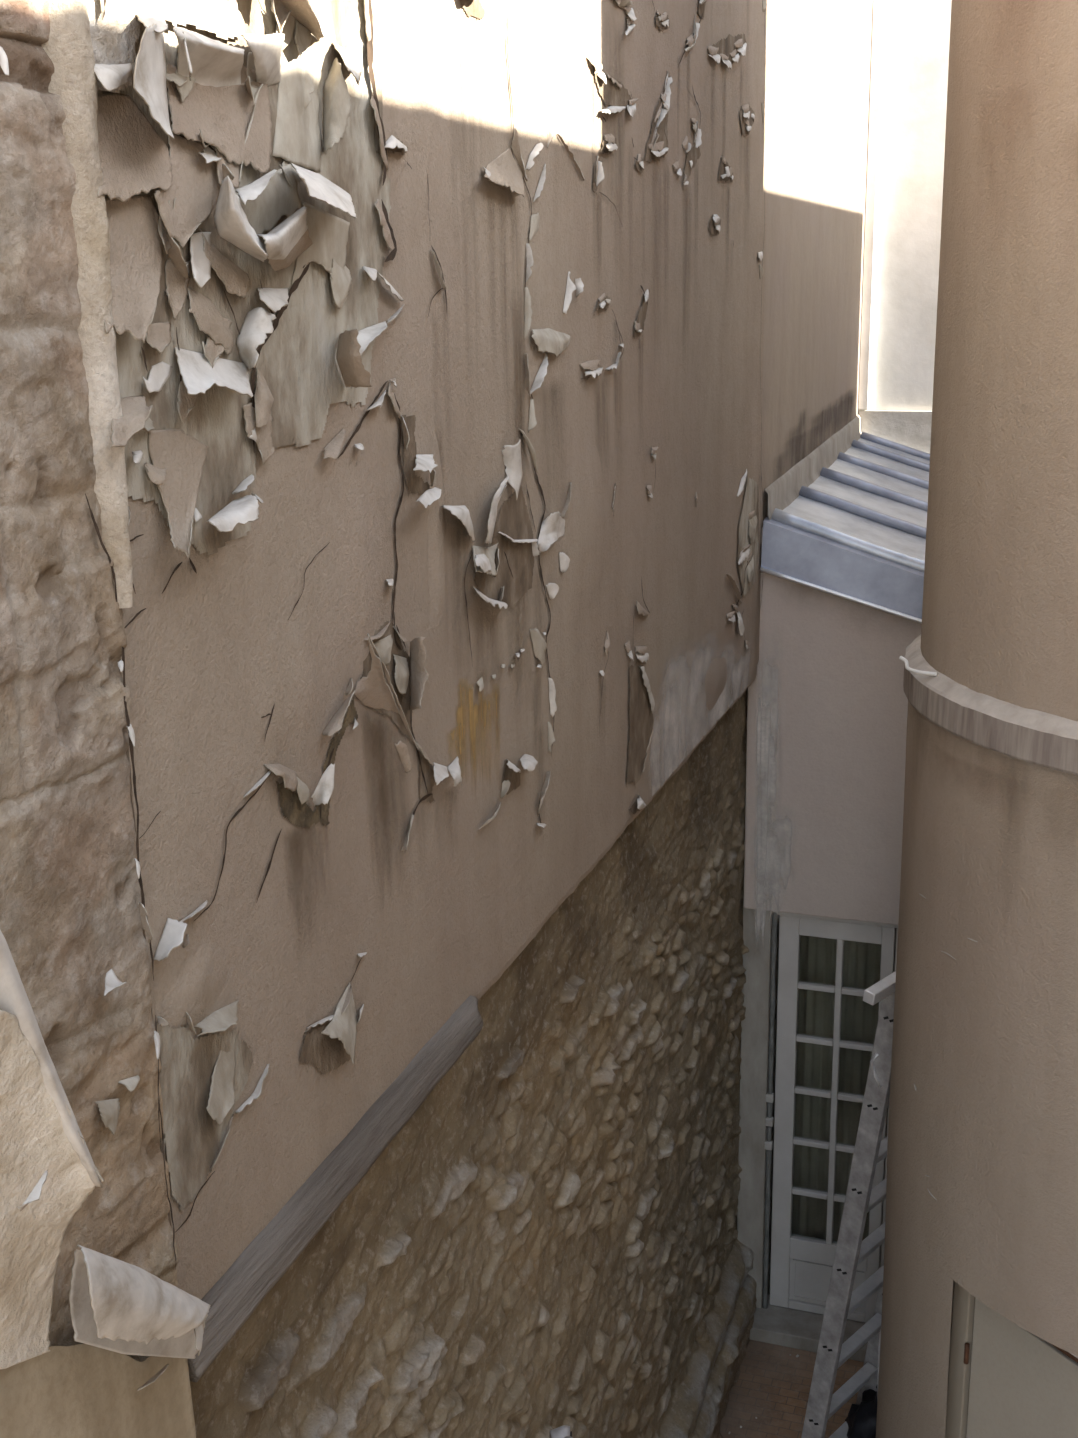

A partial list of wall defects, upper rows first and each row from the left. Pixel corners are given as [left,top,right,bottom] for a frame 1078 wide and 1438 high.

peeling [586,0,747,227]
peeling [86,0,412,558]
crack [288,542,330,620]
crack [338,381,406,648]
peeling [400,415,534,667]
crack [85,493,272,980]
crack [261,706,274,738]
peeling [243,613,462,903]
peeling [0,930,211,1391]
crack [155,1015,176,1261]
peeling [154,1000,270,1233]
peeling [300,952,367,1075]